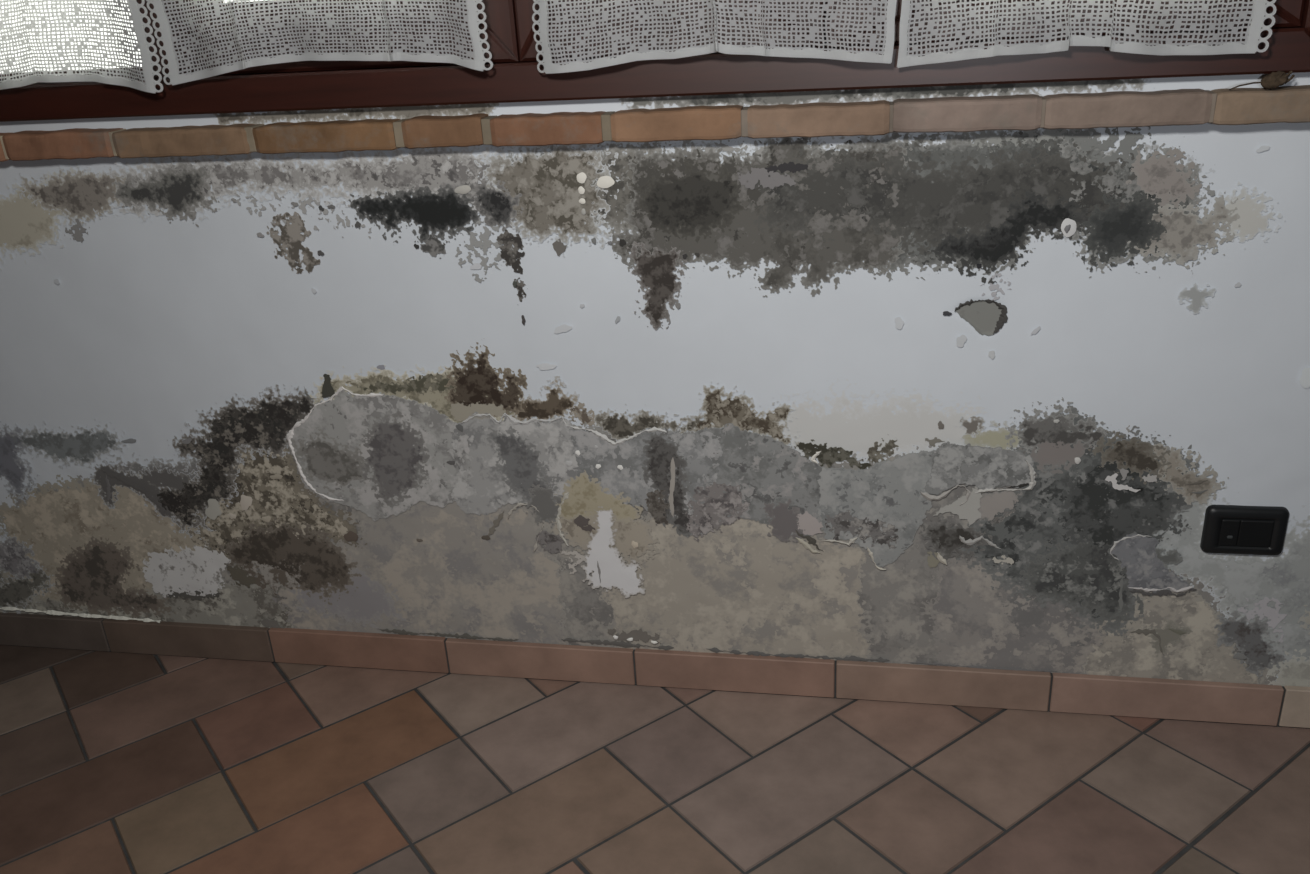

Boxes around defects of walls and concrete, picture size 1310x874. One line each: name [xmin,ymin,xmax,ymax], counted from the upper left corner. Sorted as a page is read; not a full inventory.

damp [0,126,1286,330]
flaking render [956,300,1002,336]
flaking render [0,390,1282,685]
damp [0,342,1310,687]